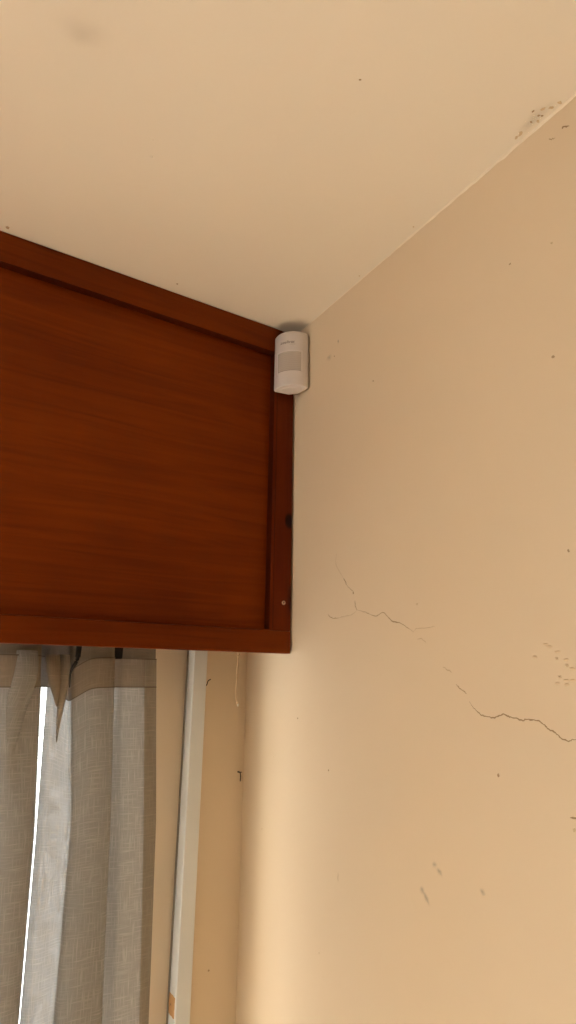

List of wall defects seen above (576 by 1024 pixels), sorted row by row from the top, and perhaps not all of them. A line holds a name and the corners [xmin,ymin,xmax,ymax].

crack [328,555,434,642]
crack [443,667,576,742]